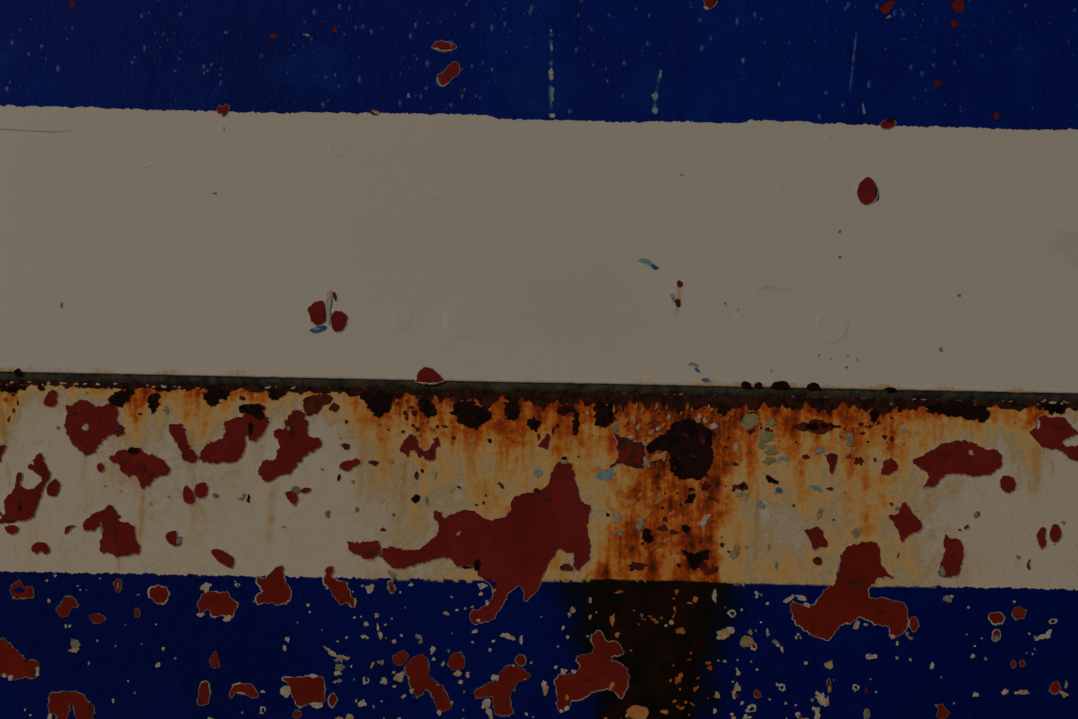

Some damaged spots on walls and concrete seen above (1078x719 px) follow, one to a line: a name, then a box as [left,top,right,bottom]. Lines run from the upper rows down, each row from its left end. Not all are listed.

peeling [0,453,61,535]
peeling [0,381,171,490]
peeling [64,504,141,558]
peeling [196,549,240,622]
peeling [138,385,348,506]
rust [0,368,1078,719]
peeling [280,456,835,719]
peeling [337,366,907,554]
peeling [783,528,920,662]
peeling [938,511,980,578]
peeling [912,439,1017,493]
peeling [1029,399,1078,462]